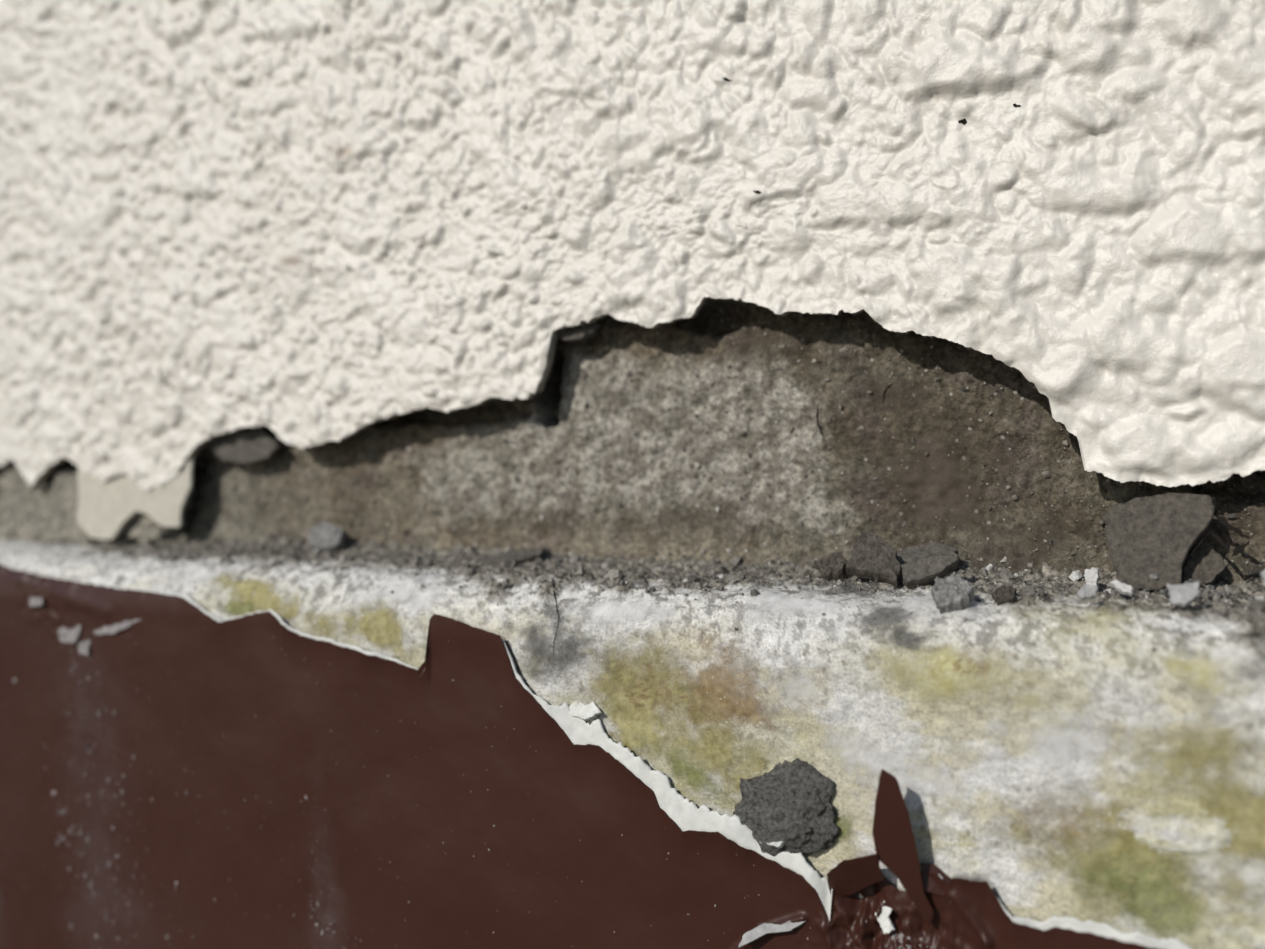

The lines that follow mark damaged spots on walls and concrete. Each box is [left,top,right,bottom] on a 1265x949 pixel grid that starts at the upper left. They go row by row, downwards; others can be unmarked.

leakage [894,436,977,524]
leakage [170,563,298,619]
leakage [346,570,441,650]
leakage [526,605,581,677]
peeling [0,297,1265,949]
leakage [746,582,871,616]
leakage [861,596,1012,697]
leakage [598,649,767,793]
leakage [831,731,938,790]
leakage [1153,734,1265,858]
leakage [1051,804,1201,933]
leakage [892,932,933,949]